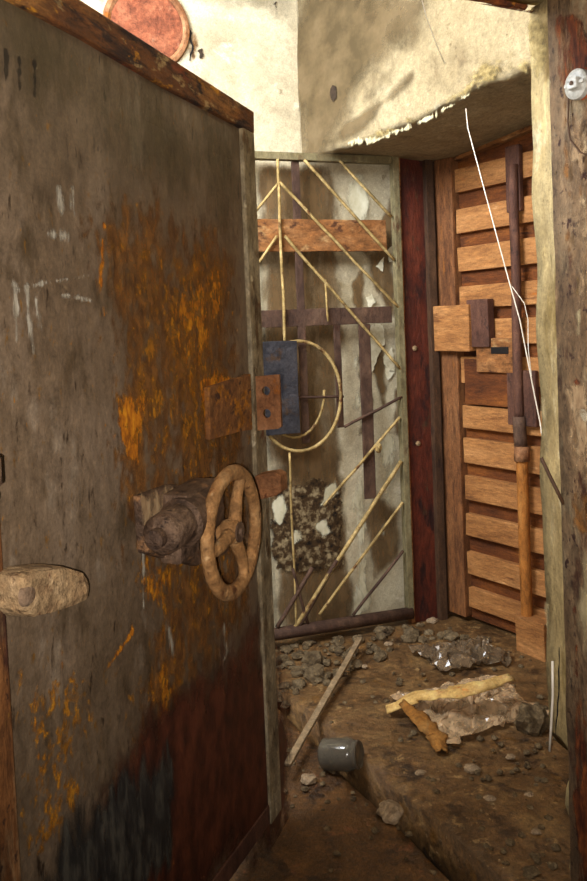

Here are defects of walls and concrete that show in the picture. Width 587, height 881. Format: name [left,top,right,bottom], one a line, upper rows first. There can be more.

corrosion [555,14,587,85]
leakage [258,0,453,220]
corrosion [99,222,124,287]
leakage [266,251,339,310]
leakage [352,202,394,314]
corrosion [114,249,237,485]
leakage [374,345,399,435]
leakage [265,325,352,625]
leakage [365,498,399,572]
corrosion [135,557,183,646]
corrosion [28,673,93,853]